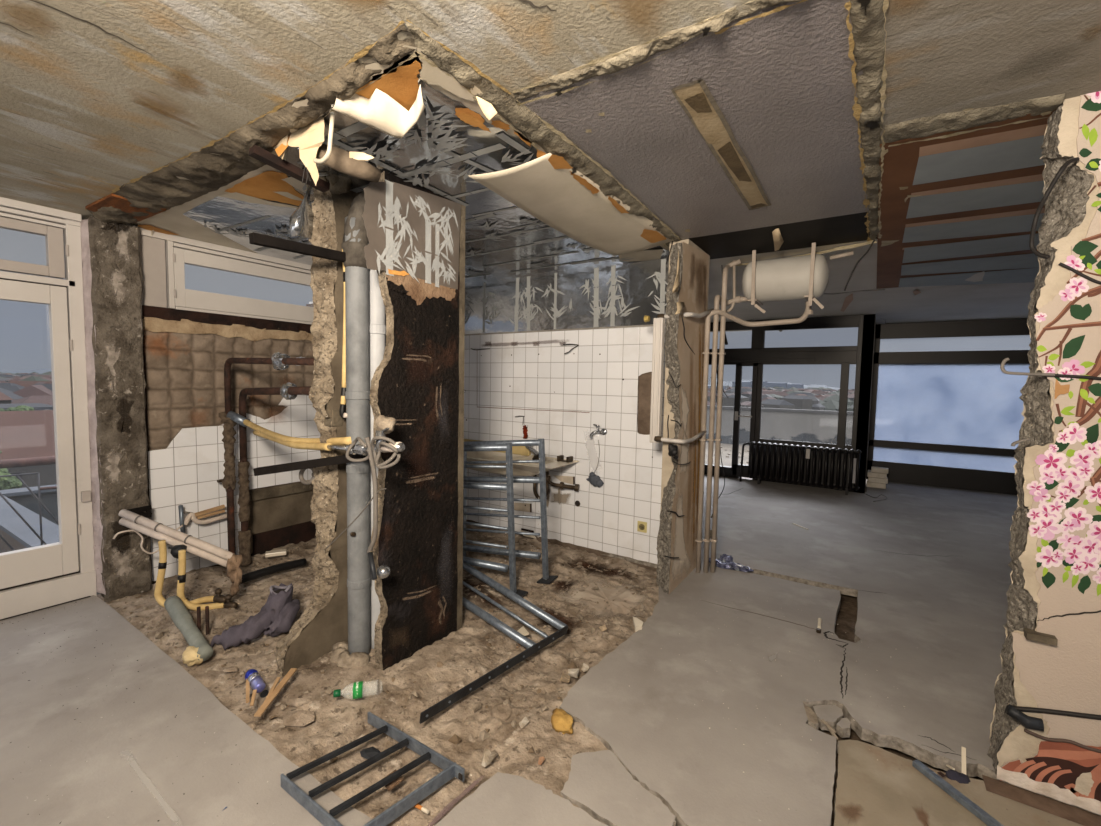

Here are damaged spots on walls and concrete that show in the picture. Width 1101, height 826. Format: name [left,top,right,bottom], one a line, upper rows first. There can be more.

peeling [101,19,511,199]
peeling [844,0,899,247]
spalling [106,344,119,390]
spalling [105,451,120,483]
spalling [110,224,131,303]
peeling [142,187,339,677]
flaking render [385,269,456,305]
spalling [656,242,690,595]
spalling [987,102,1094,774]
crack [702,600,848,698]